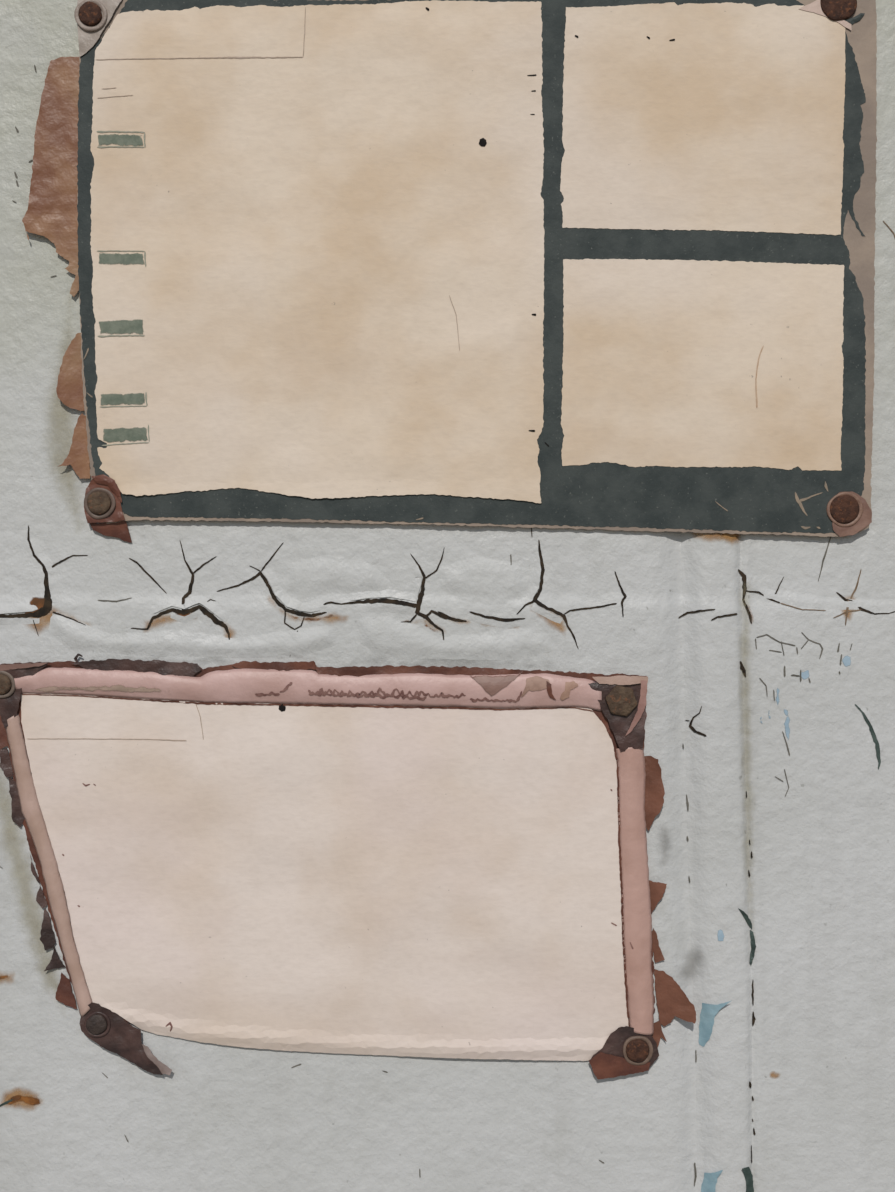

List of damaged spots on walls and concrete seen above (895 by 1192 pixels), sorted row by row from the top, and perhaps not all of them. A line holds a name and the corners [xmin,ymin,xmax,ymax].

crack [0,526,627,648]
crack [679,537,895,701]
peeling [784,666,811,683]
peeling [837,643,852,674]
peeling [776,688,790,756]
peeling [695,1001,731,1062]
peeling [694,1163,723,1192]
peeling [742,1119,755,1192]